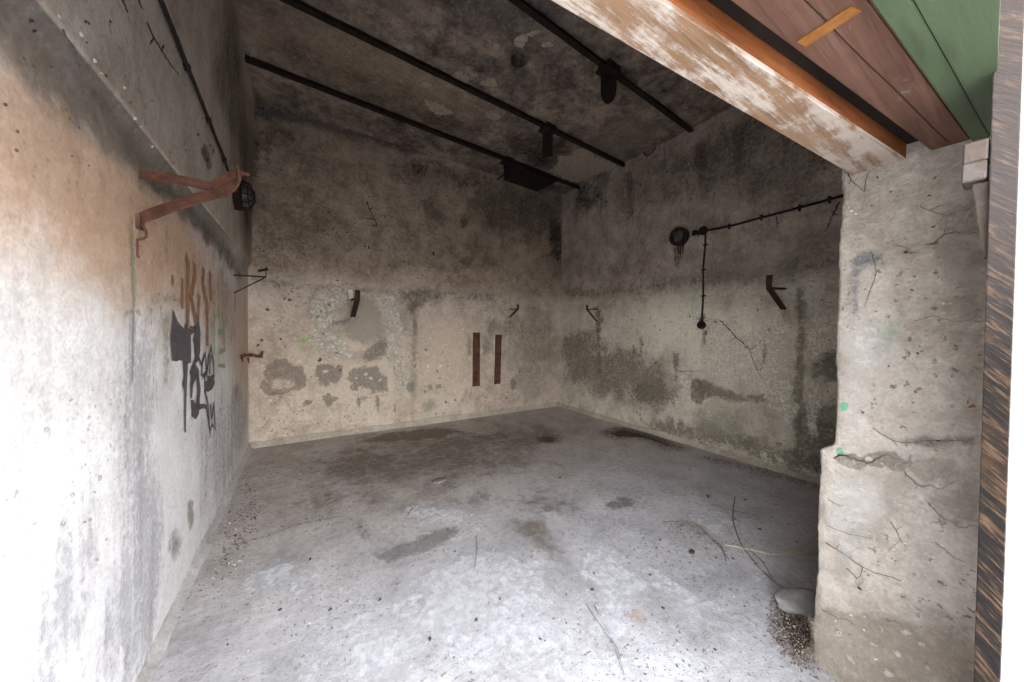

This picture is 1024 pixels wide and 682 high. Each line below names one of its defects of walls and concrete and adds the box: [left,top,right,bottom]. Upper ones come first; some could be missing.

peeling [241,286,453,412]
leakage [562,288,837,473]
crack [720,320,762,378]
crack [873,428,978,449]
crack [825,499,906,581]